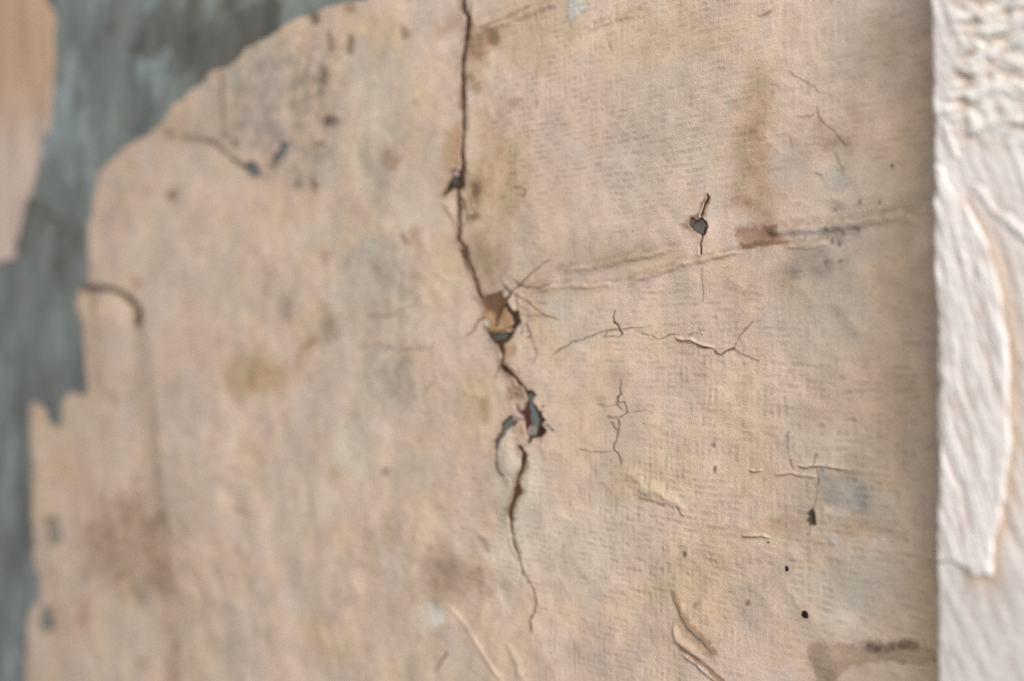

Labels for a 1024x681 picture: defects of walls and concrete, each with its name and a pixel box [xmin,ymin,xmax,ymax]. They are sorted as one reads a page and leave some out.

crack [454,0,557,394]
peeling [0,0,366,681]
crack [611,379,627,461]
crack [509,445,537,631]
crack [807,510,815,525]